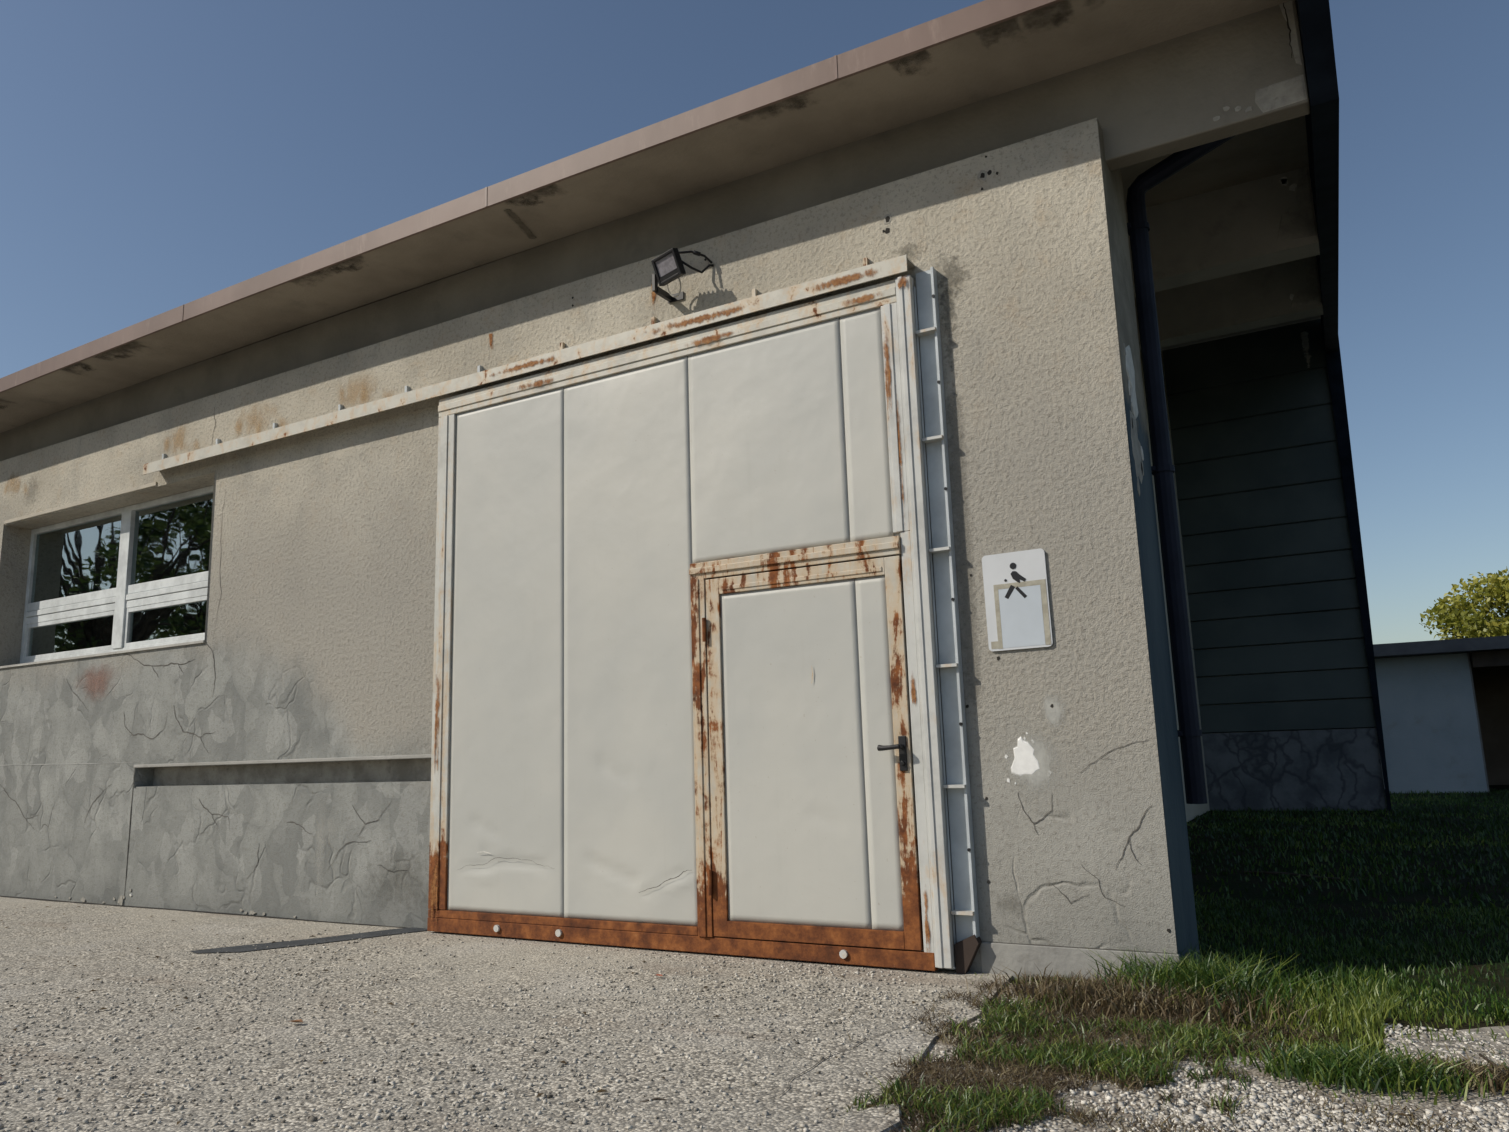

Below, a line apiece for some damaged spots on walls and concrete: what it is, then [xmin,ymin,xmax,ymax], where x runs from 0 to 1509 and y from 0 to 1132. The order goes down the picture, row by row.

corrosion [816,269,875,303]
corrosion [653,307,742,345]
corrosion [493,357,554,390]
corrosion [884,337,904,503]
peeling [1005,732,1052,784]
crack [1080,738,1152,773]
crack [1018,796,1052,834]
crack [1052,805,1152,906]
crack [984,941,1177,954]